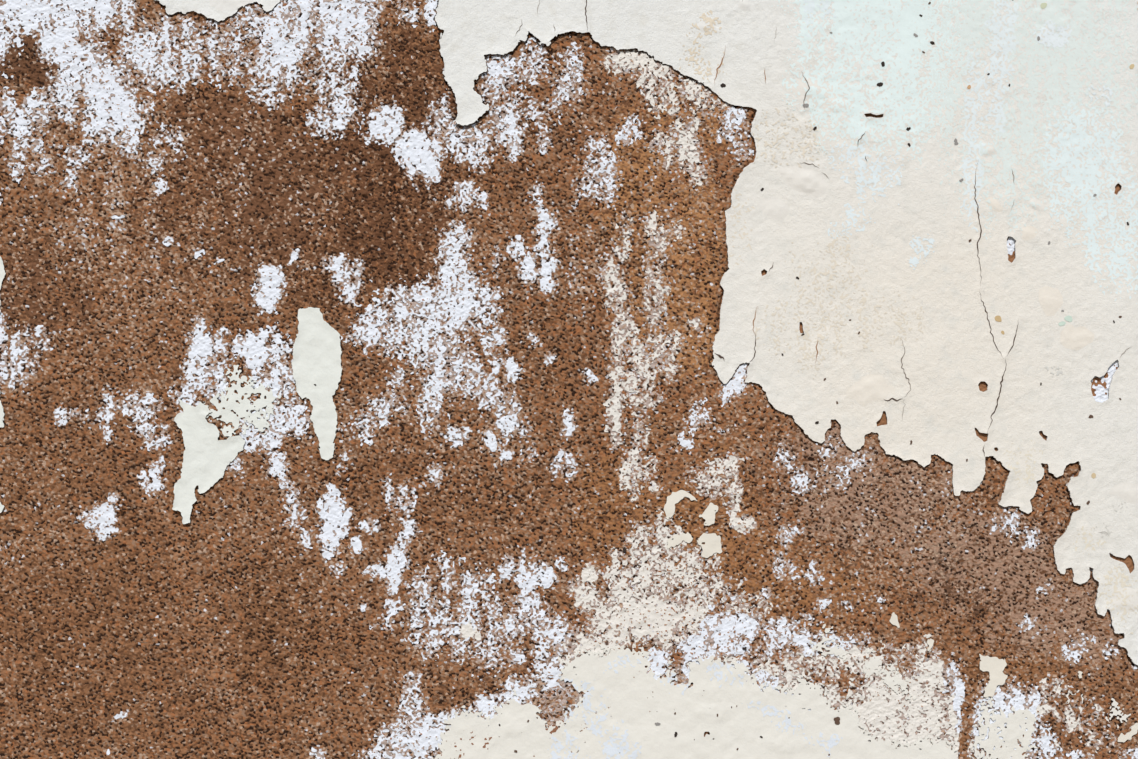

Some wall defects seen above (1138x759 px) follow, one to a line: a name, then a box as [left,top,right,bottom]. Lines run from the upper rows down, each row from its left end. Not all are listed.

spalling [49,0,70,35]
peeling [1007,236,1016,263]
crack [974,163,1018,456]
peeling [1091,360,1121,403]
peeling [1109,553,1134,573]
spalling [892,709,914,737]